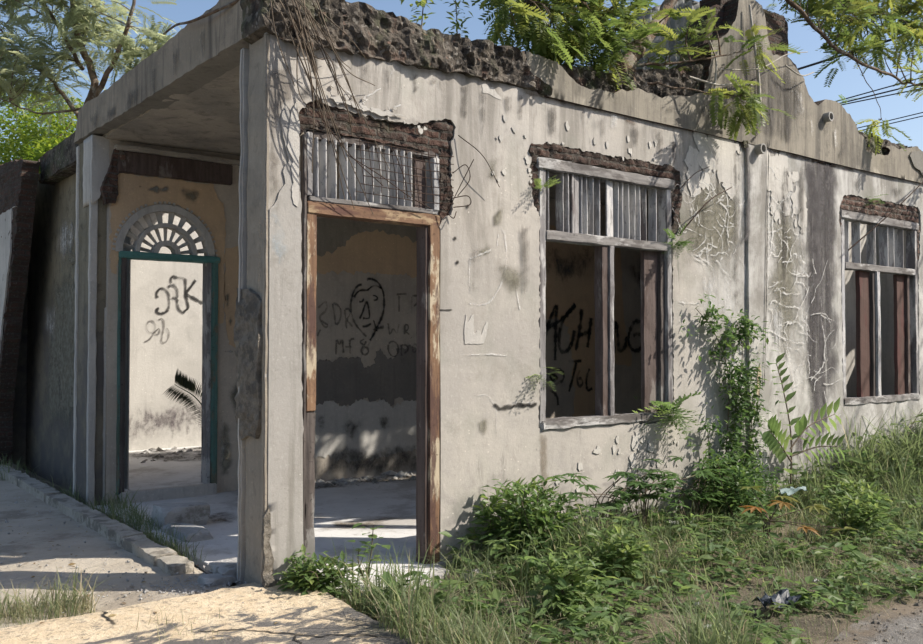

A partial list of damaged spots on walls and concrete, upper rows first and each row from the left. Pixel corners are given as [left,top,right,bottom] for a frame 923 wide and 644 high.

spalling [240,0,553,100]
leakage [726,22,801,140]
spalling [495,114,749,240]
leakage [782,197,791,267]
peeling [100,69,454,588]
leakage [799,160,837,434]
leakage [330,448,415,472]
peeling [612,431,678,486]